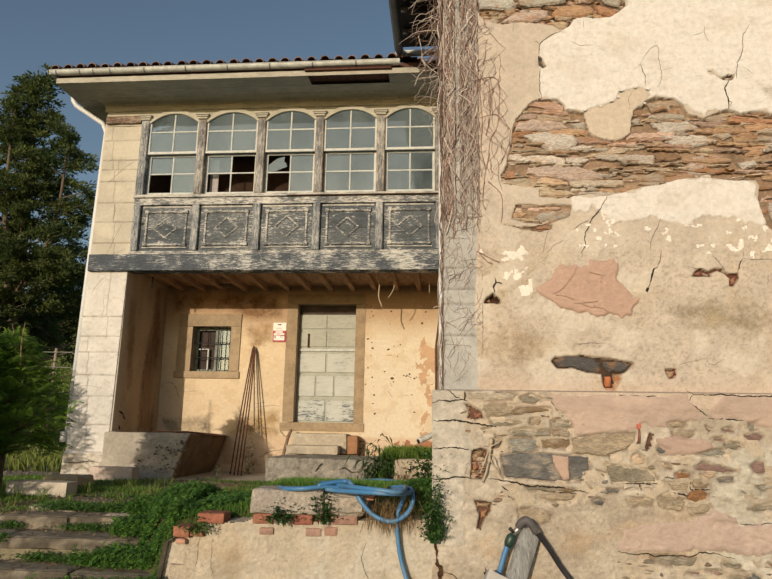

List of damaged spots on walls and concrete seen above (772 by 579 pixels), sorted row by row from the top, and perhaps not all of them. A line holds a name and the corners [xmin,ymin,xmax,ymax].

spalling [477,0,625,30]
crack [724,25,754,108]
spalling [501,86,772,259]
peeling [501,245,533,296]
crack [645,219,662,292]
spalling [693,269,739,286]
spalling [552,355,631,388]
crack [432,389,501,427]
crack [687,391,772,421]
crack [401,447,586,494]
spalling [460,390,772,530]
crack [434,544,457,579]